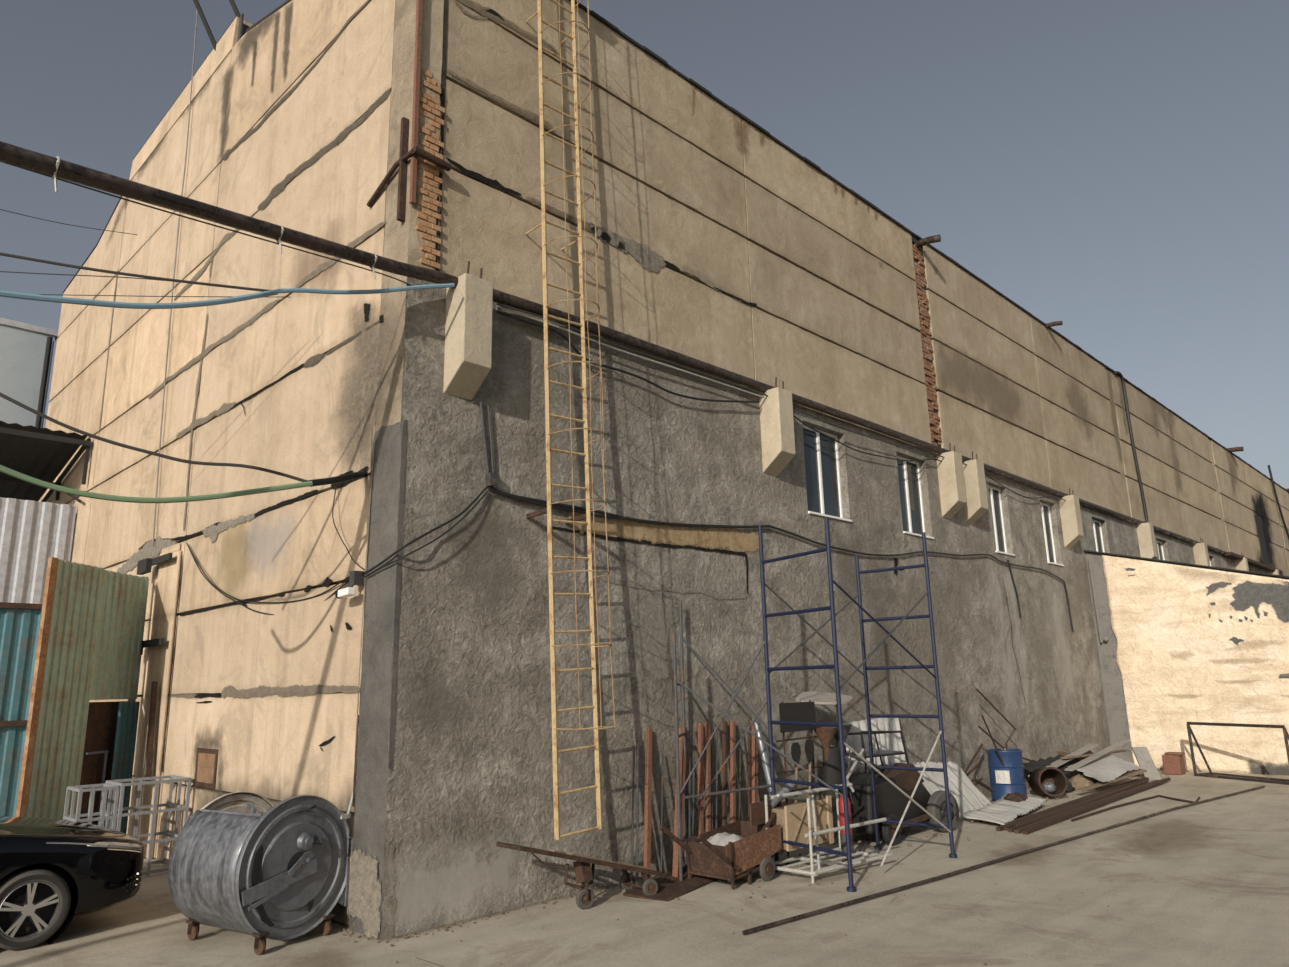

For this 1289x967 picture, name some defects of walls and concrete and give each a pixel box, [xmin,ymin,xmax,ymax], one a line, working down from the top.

water stain [220,3,292,160]
spalling [590,223,666,272]
spalling [202,513,255,543]
spalling [117,536,176,573]
peeling [1206,581,1289,645]